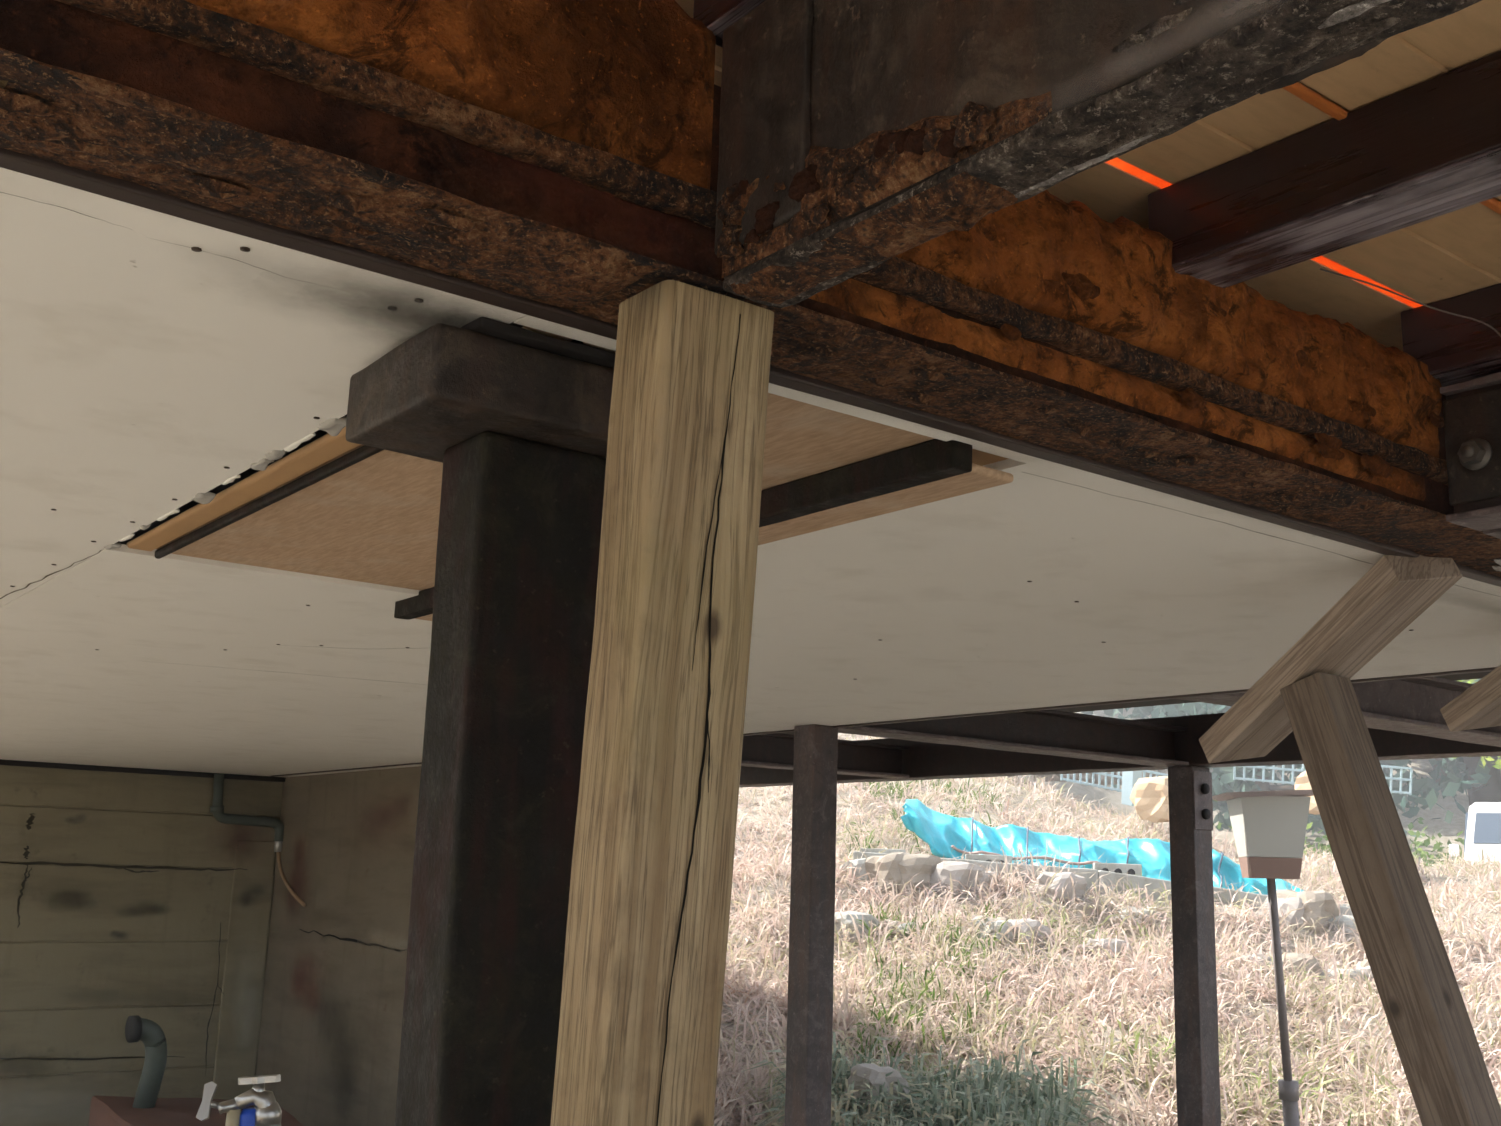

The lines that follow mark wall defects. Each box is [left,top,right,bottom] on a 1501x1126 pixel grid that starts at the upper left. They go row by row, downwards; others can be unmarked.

rust [185,0,1444,501]